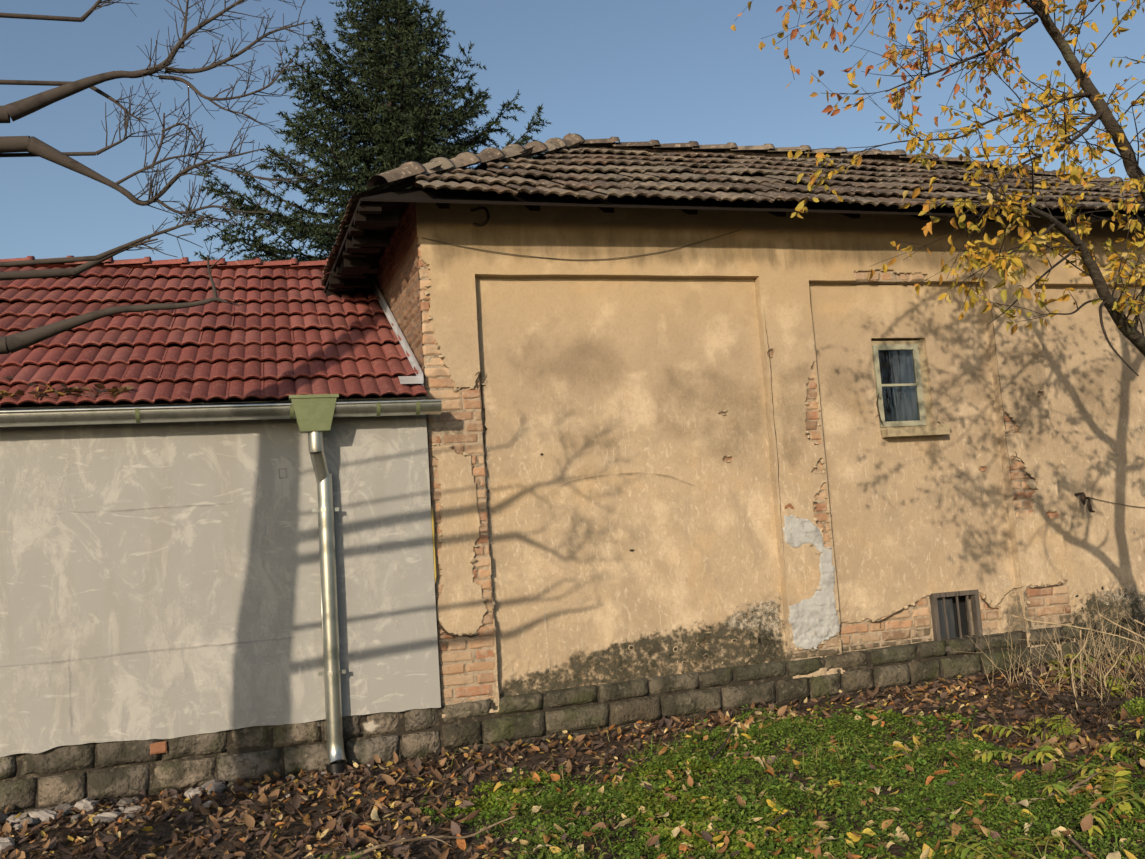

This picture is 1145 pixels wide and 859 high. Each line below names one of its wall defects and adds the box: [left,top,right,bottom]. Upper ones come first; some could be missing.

flaking render [804,362,821,445]
flaking render [417,245,496,705]
flaking render [1002,456,1059,519]
peeling [783,459,934,661]
damp [499,601,791,697]
flaking render [979,594,1003,635]
flaking render [1025,580,1083,630]